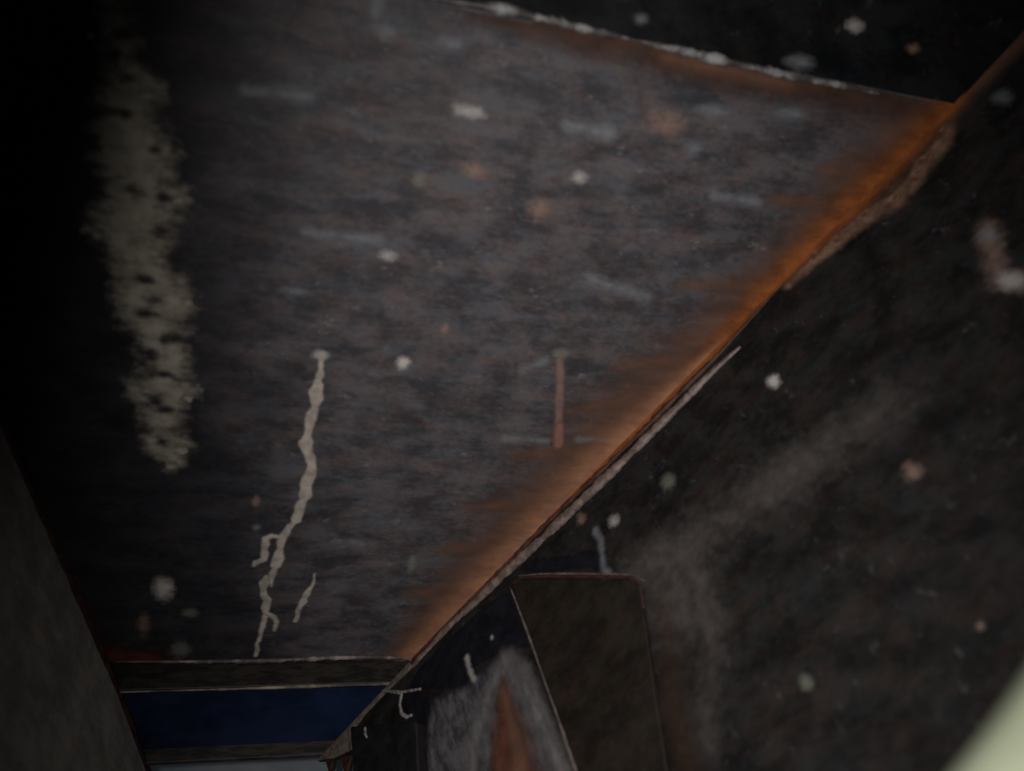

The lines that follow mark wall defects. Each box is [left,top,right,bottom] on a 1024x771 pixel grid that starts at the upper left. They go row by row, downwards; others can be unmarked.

crack [252,352,325,657]
corrosion [396,12,1024,661]